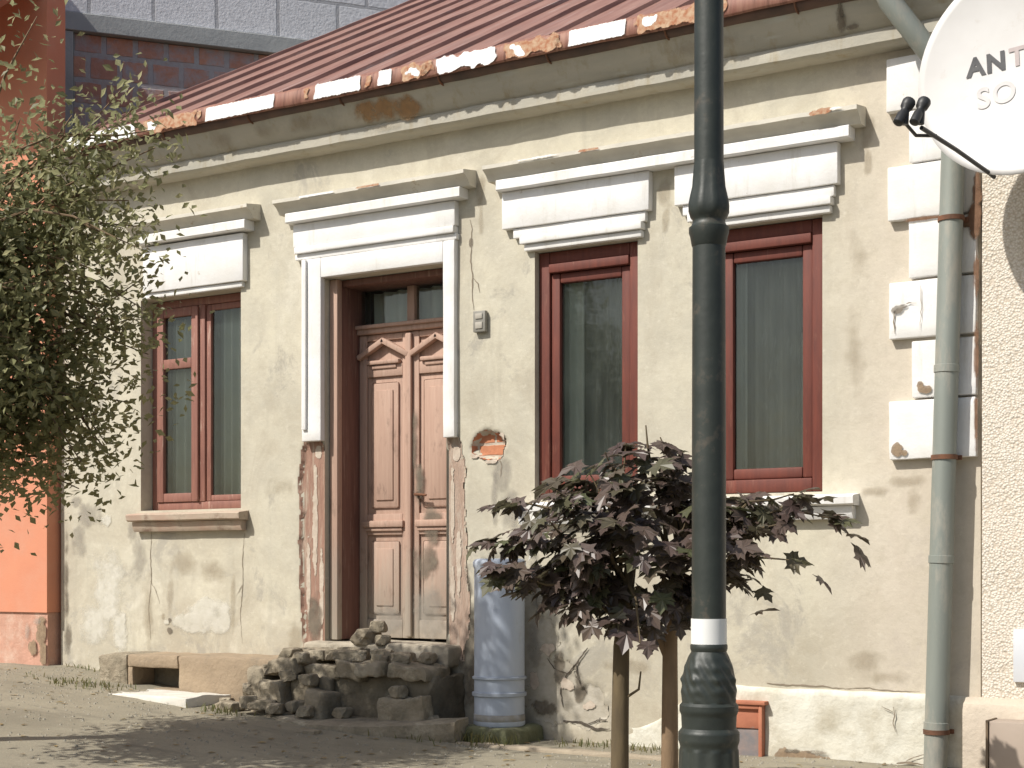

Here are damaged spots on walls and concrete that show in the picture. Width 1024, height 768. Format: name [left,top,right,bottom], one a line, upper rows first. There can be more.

corrosion [356,95,420,121]
crack [470,222,480,310]
spalling [891,302,922,333]
spalling [917,381,932,394]
spalling [891,442,907,457]
crack [148,532,160,639]
peeling [298,441,325,647]
peeling [447,430,506,661]
crack [547,648,608,730]